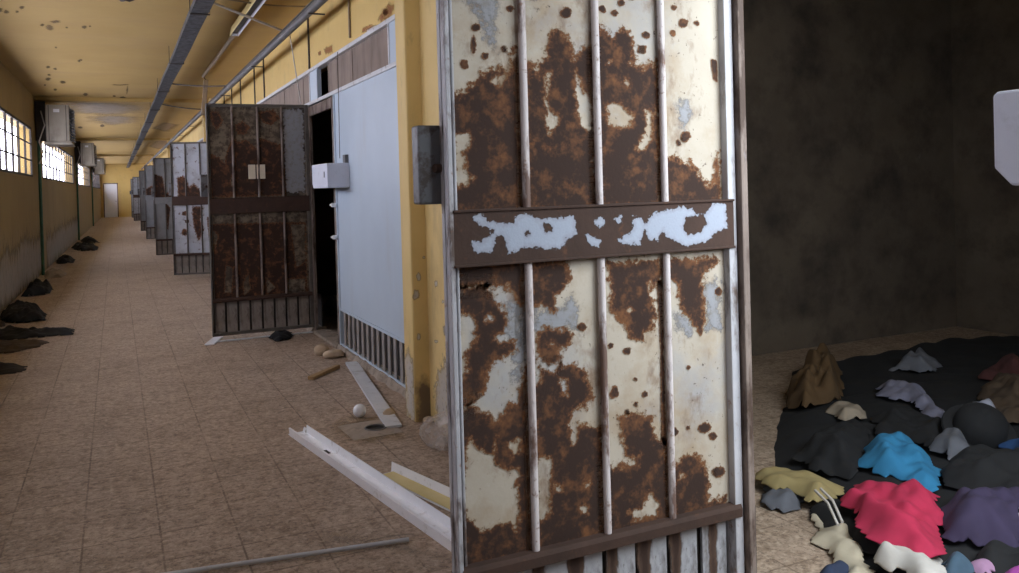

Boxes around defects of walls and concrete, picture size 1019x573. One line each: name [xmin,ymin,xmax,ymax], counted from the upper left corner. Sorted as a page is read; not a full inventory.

corrosion [450,0,722,210]
corrosion [146,120,309,299]
peeling [405,347,415,421]
peeling [434,360,448,431]
corrosion [455,253,728,564]
corrosion [567,556,584,573]
corrosion [606,548,619,573]
corrosion [636,539,652,573]
corrosion [669,532,683,573]
corrosion [708,523,718,573]